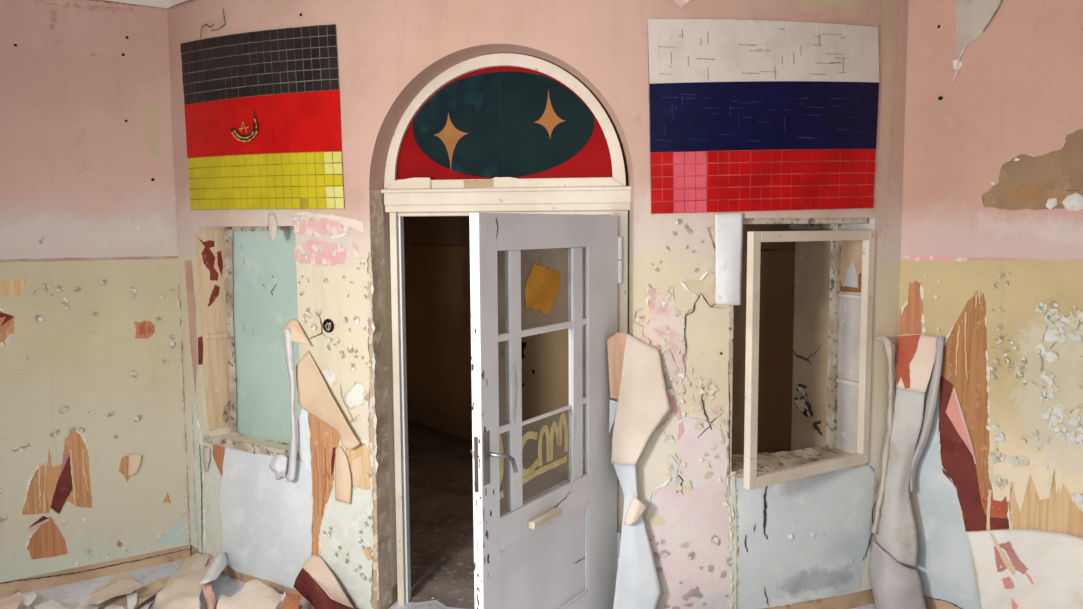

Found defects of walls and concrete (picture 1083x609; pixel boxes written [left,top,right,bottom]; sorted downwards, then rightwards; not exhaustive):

peeling [953,0,1003,85]
spalling [981,129,1083,212]
spalling [219,177,623,609]
crack [683,293,731,493]
flaking render [635,268,876,609]
crack [744,486,768,552]
flaking render [916,377,980,609]
peeling [986,301,1083,489]